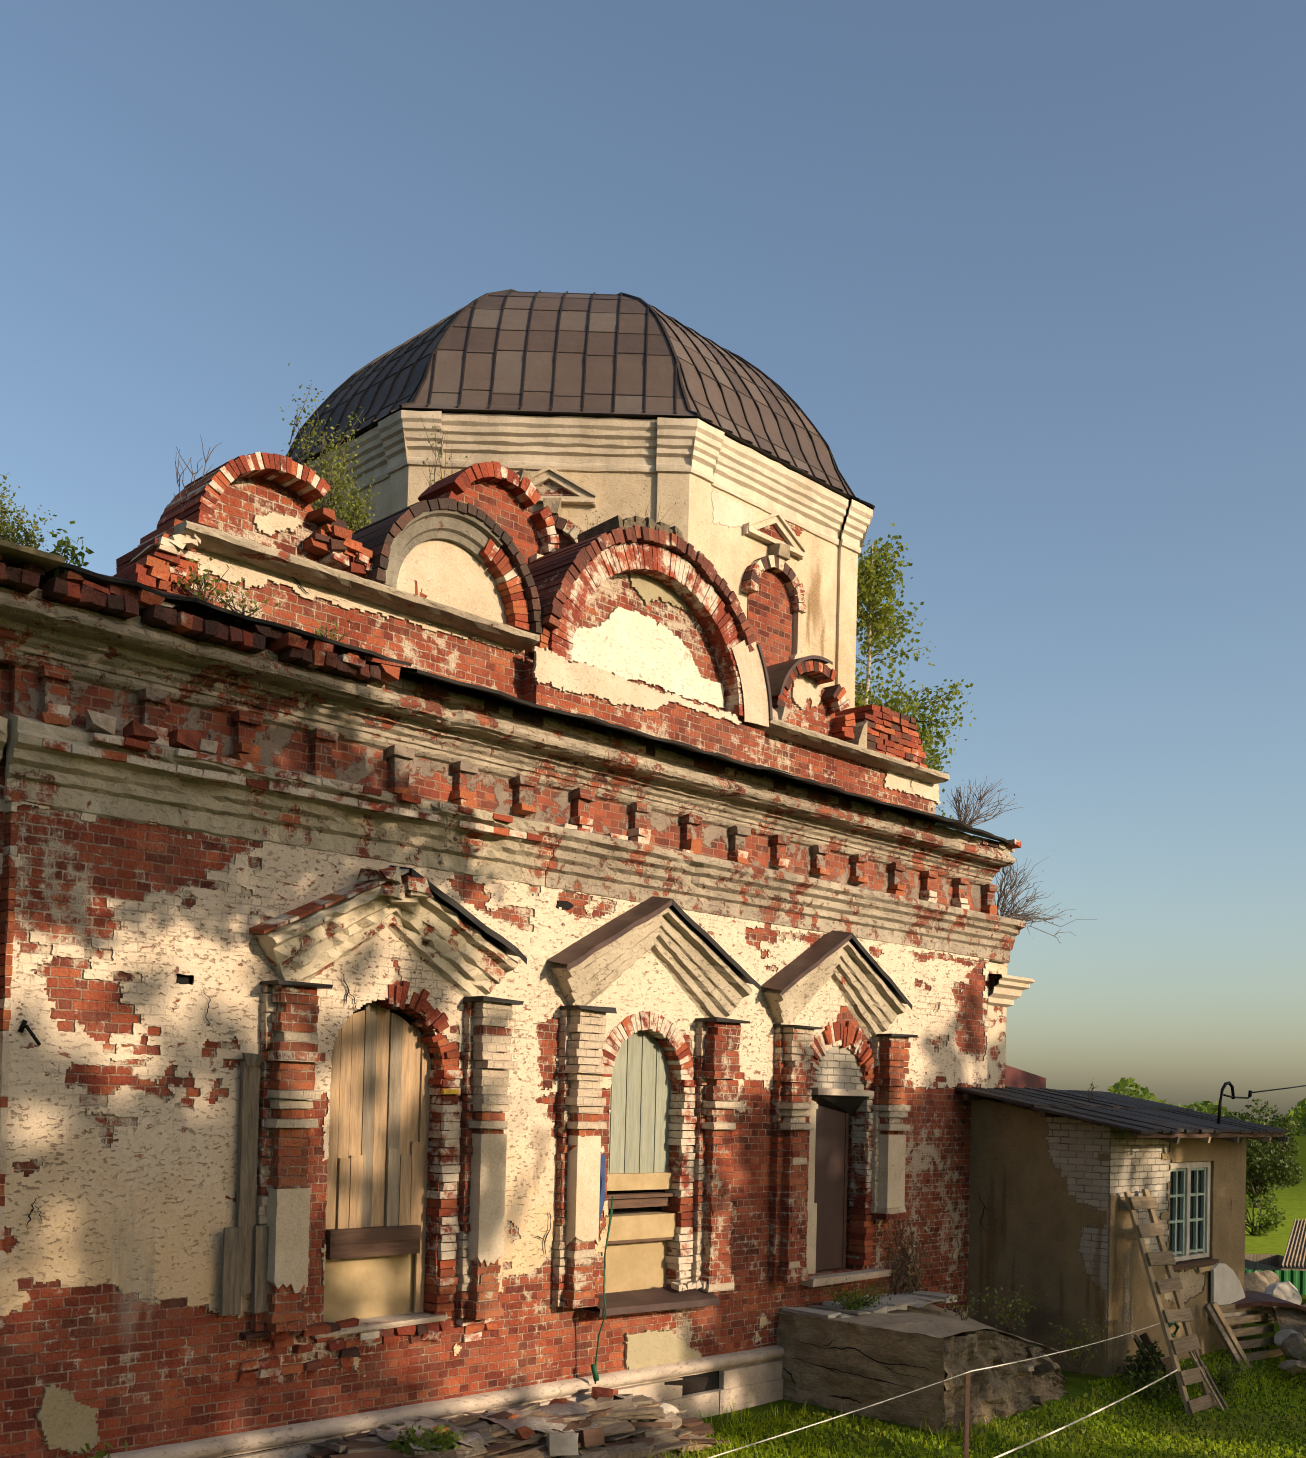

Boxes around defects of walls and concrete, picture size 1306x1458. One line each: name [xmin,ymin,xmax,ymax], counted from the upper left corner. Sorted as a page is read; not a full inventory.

spalling [0,788,271,1149]
spalling [909,950,988,1061]
spalling [0,1006,980,1458]
spalling [1045,1117,1171,1292]